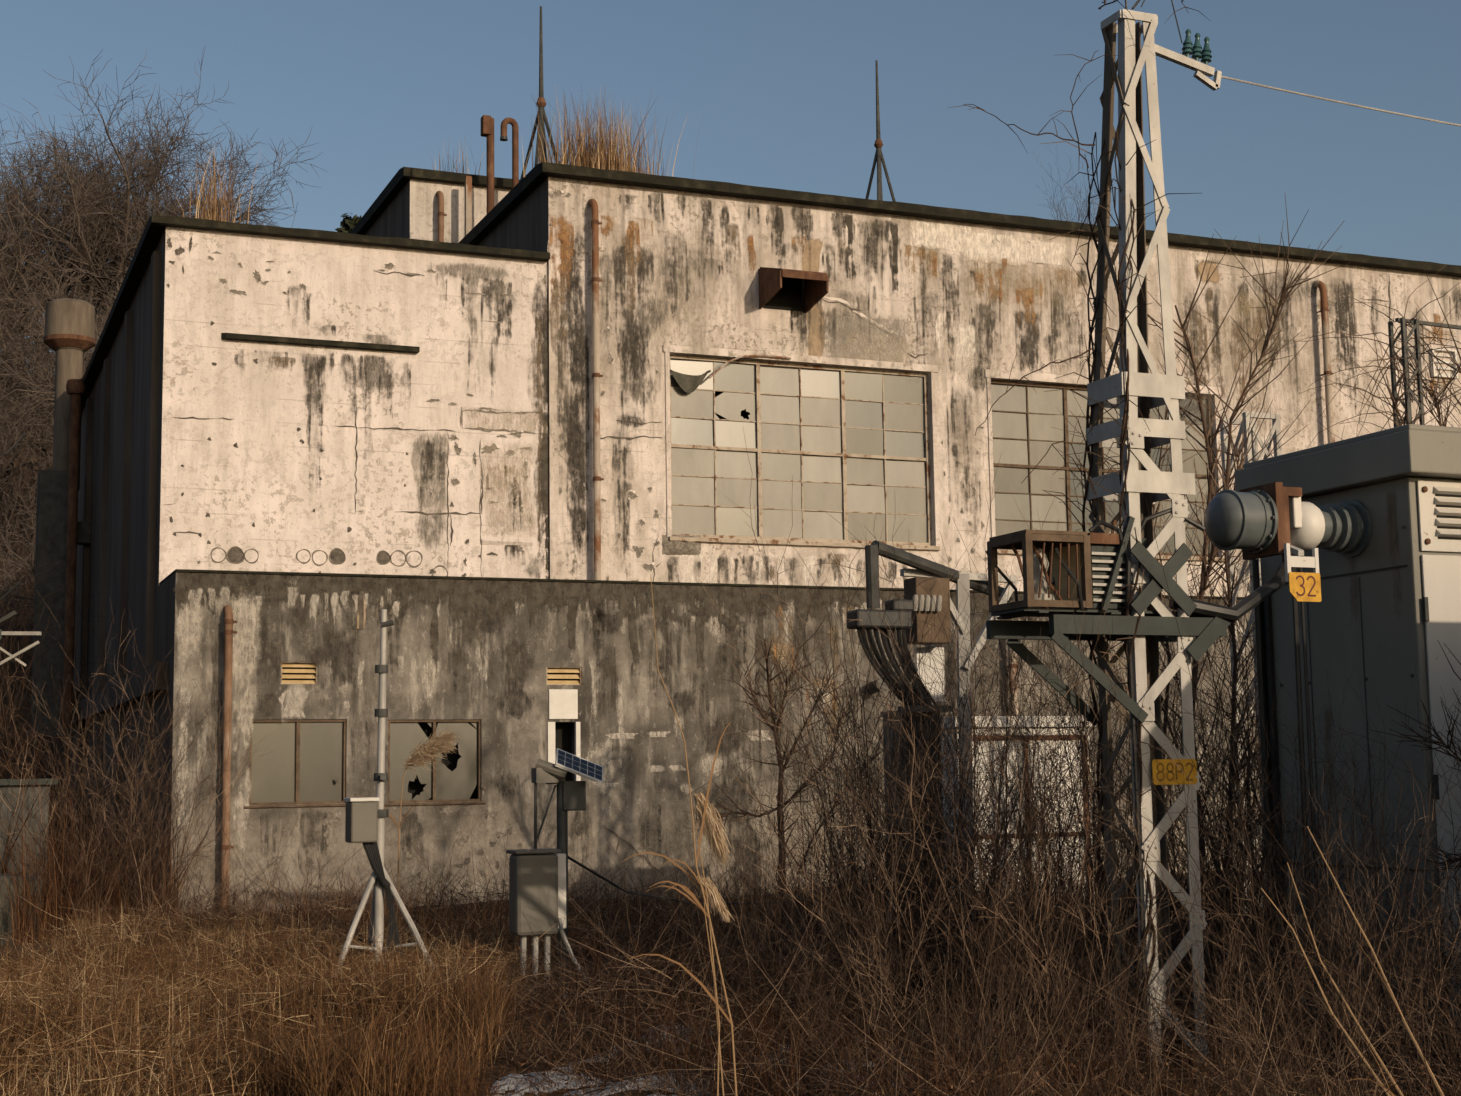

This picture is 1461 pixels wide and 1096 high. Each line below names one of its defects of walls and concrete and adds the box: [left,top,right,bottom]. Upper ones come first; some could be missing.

rust [601,217,653,311]
water stain [619,194,684,220]
rust [748,236,756,269]
water stain [914,247,1083,506]
water stain [174,201,906,888]
water stain [950,592,1032,628]